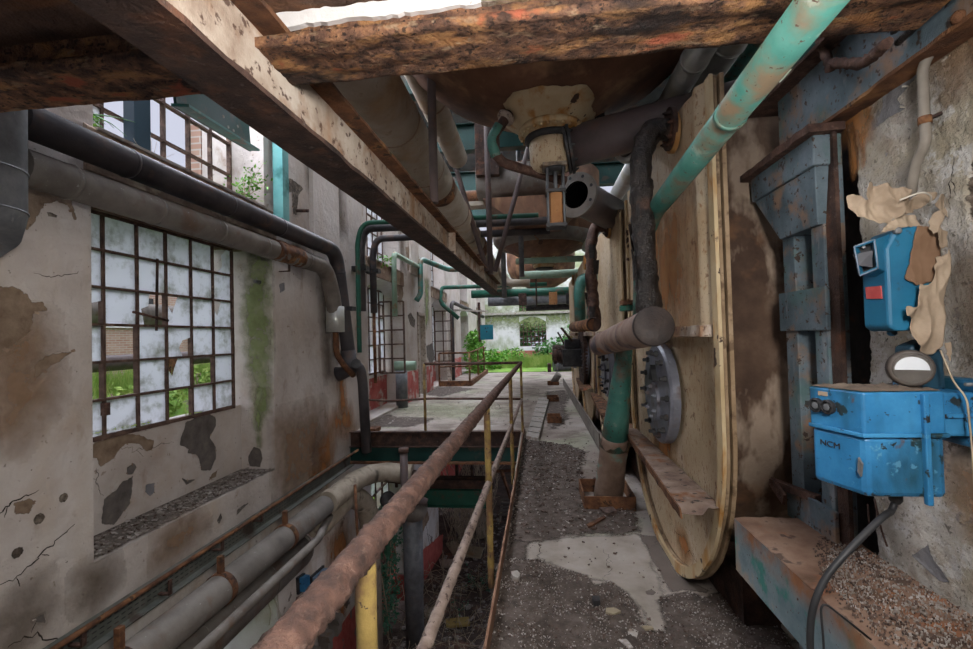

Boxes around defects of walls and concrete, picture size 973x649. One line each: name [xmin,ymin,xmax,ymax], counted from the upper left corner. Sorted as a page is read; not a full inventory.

spalling [965,163,973,217]
crack [0,491,37,518]
peeling [93,414,275,559]
crack [0,524,75,586]